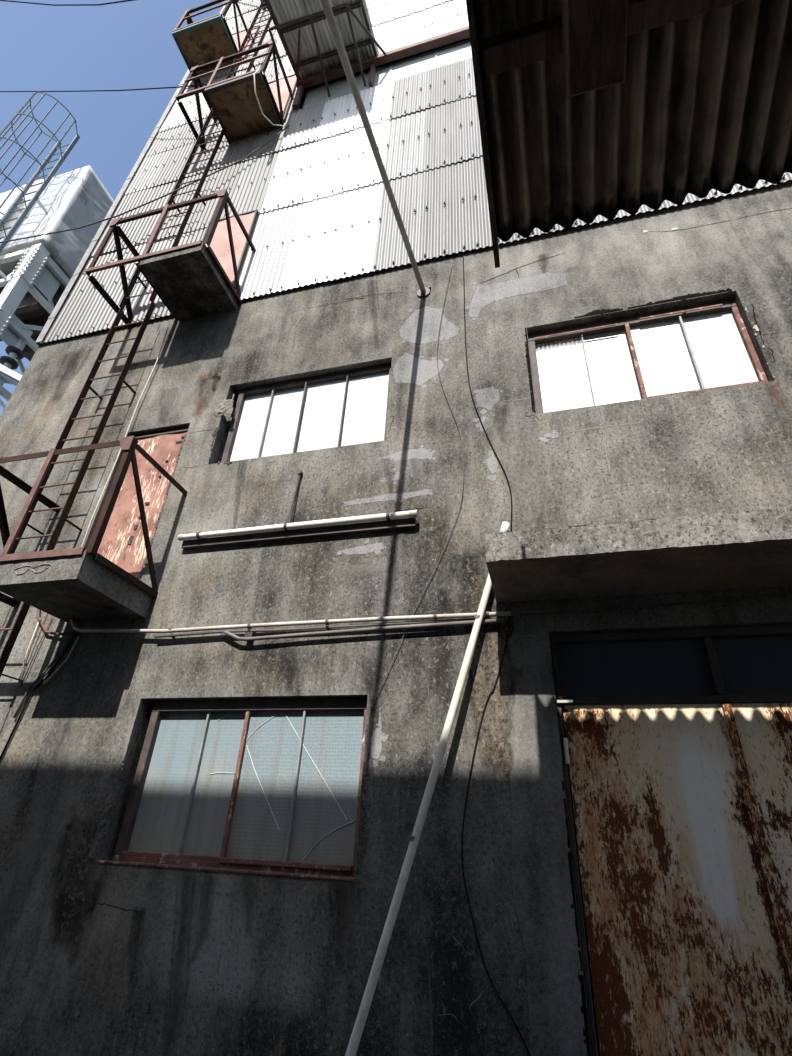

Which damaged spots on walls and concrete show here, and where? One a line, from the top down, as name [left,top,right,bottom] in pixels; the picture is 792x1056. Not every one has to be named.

flaking render [393,269,572,388]
spalling [356,698,424,876]
water stain [52,805,100,963]